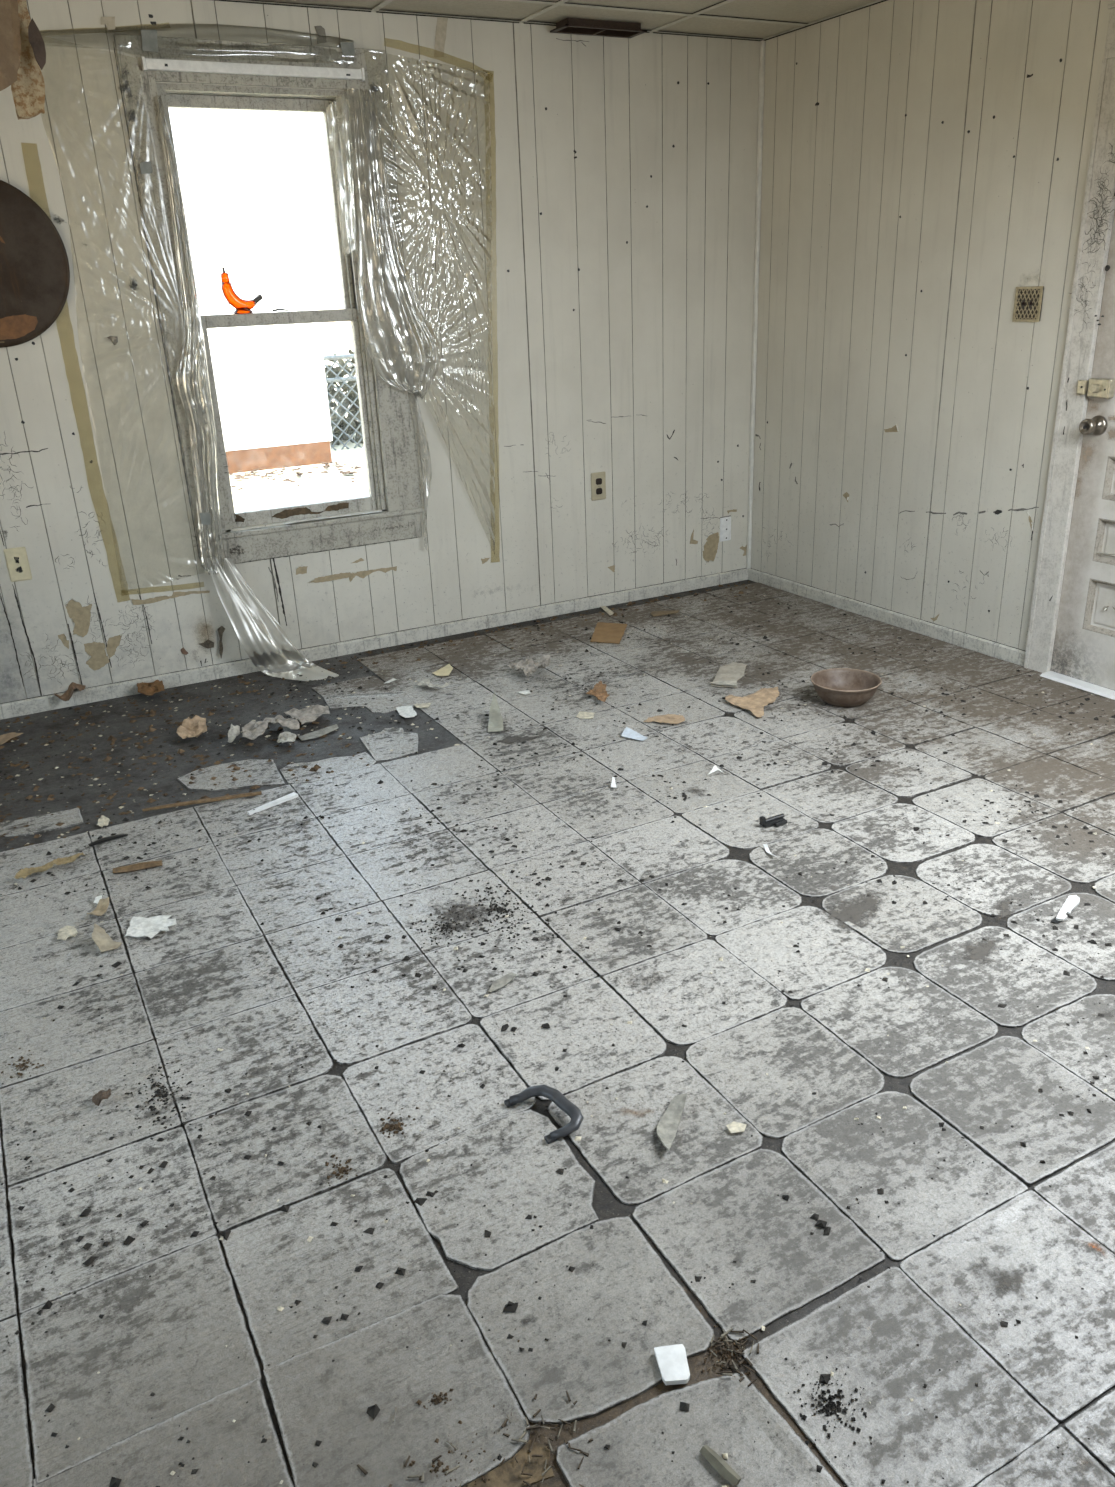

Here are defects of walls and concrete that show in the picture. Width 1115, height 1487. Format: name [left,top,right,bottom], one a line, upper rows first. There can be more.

peeling [690,529,719,563]
peeling [296,558,397,583]
peeling [58,598,123,671]
peeling [396,703,431,718]
peeling [97,815,110,827]